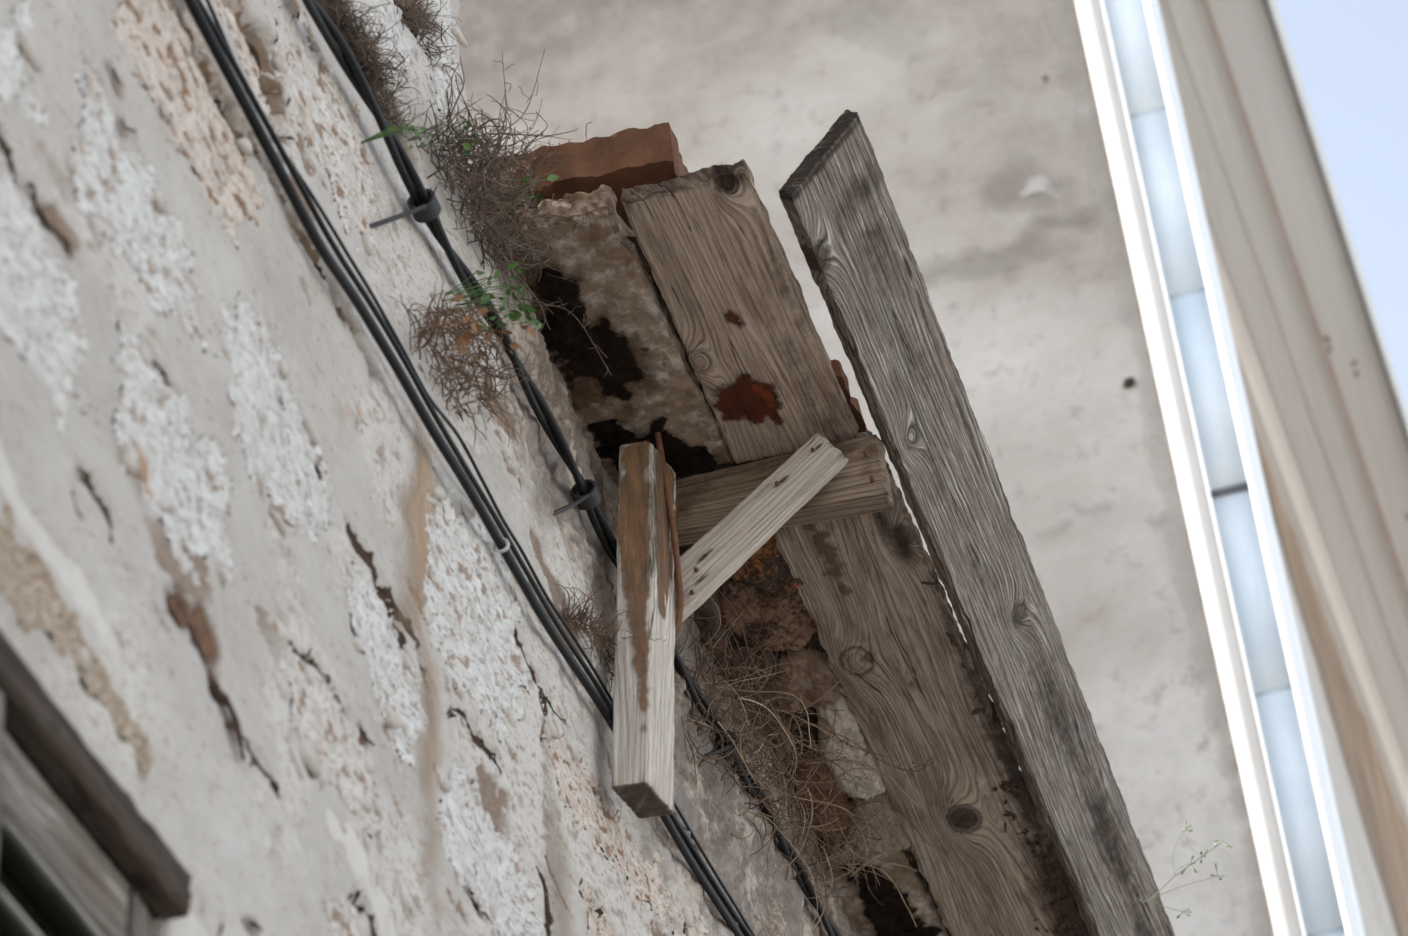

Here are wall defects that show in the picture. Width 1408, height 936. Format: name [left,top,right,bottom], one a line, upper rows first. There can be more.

spalling [0,0,50,129]
spalling [110,0,263,251]
spalling [0,157,91,435]
spalling [66,51,334,590]
peeling [0,501,155,780]
crack [218,921,263,936]
crack [210,677,280,800]
spalling [343,560,429,768]
spalling [422,485,532,745]
spalling [433,761,544,936]